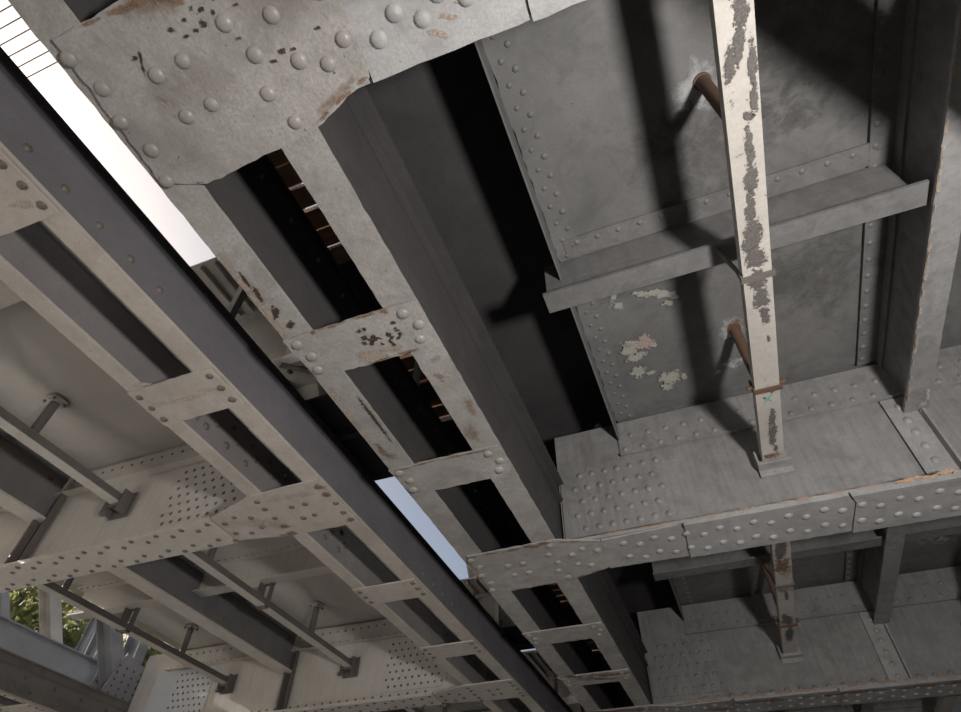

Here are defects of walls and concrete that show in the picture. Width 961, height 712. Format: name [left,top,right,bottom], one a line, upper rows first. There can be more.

peeling [723,0,771,342]
peeling [619,334,688,390]
peeling [764,391,778,451]
peeling [775,542,788,562]